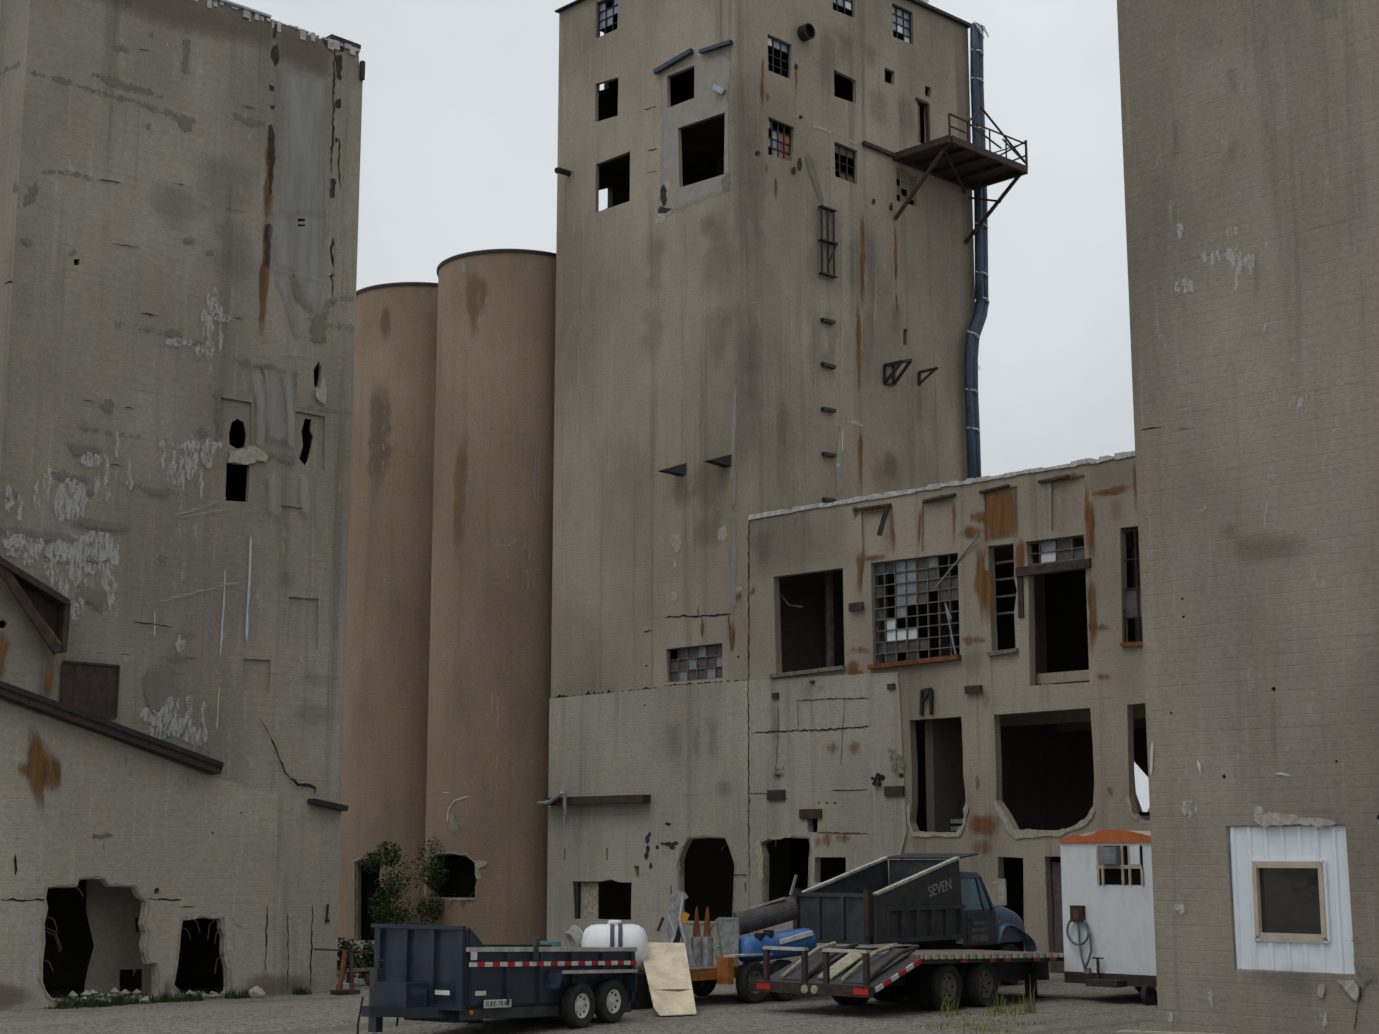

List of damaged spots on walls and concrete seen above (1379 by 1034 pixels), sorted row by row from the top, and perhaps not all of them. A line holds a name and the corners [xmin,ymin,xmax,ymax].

corrosion [259,145,272,323]
spalling [53,399,140,497]
spalling [0,516,131,564]
corrosion [853,506,895,590]
corrosion [918,487,1024,612]
corrosion [19,737,61,805]
crack [260,719,316,793]
spalling [37,874,245,1003]